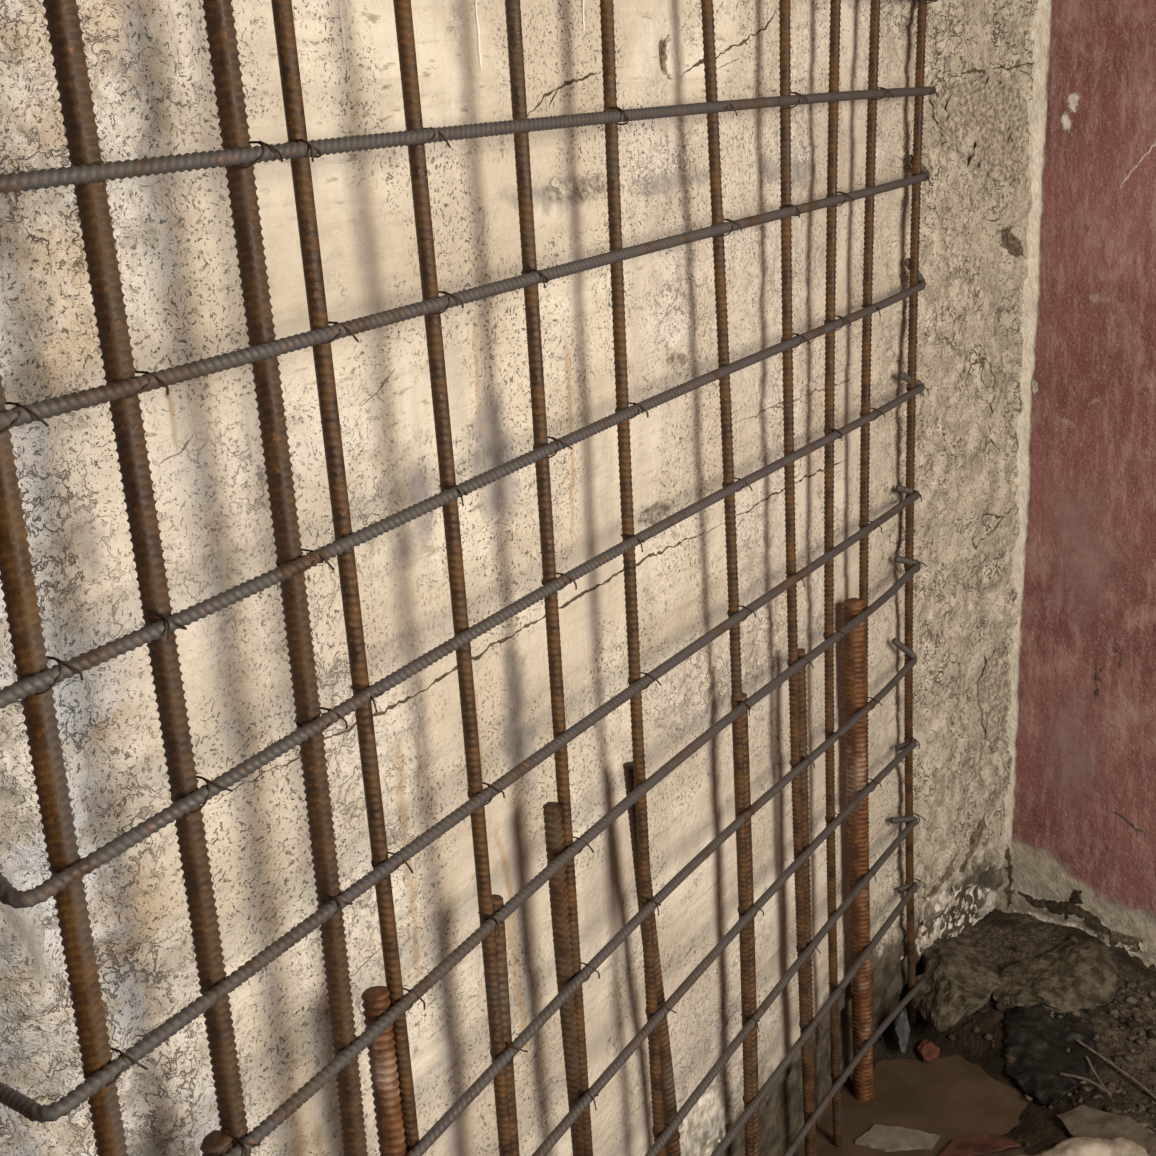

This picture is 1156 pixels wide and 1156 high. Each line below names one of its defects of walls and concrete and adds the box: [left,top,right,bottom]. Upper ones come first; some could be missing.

crack [528,71,602,115]
spalling [847,0,938,306]
spalling [823,321,844,441]
spalling [860,314,886,417]
spalling [877,292,929,489]
spalling [824,441,835,554]
spalling [859,422,874,529]
spalling [859,534,869,611]
crack [215,459,847,803]
spalling [826,830,837,920]
spalling [915,854,997,964]
flaking render [1017,1135,1149,1156]